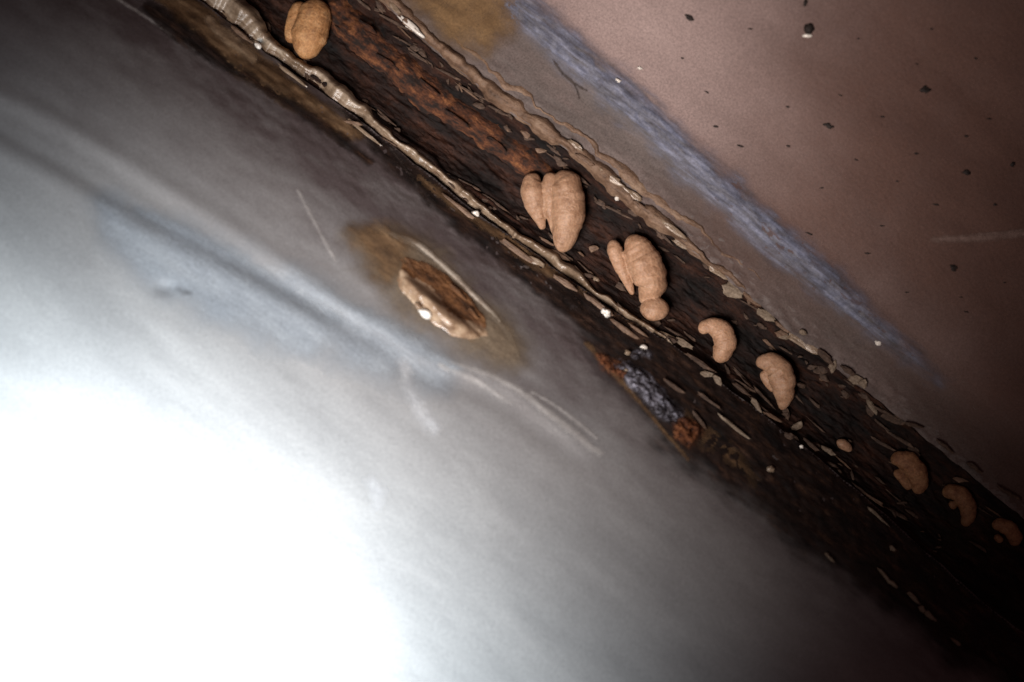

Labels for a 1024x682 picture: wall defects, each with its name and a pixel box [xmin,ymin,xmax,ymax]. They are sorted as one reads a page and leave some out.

corrosion [143,0,596,329]
corrosion [350,226,523,367]
peeling [203,0,924,456]
leakage [506,3,868,327]
corrosion [562,299,1024,682]